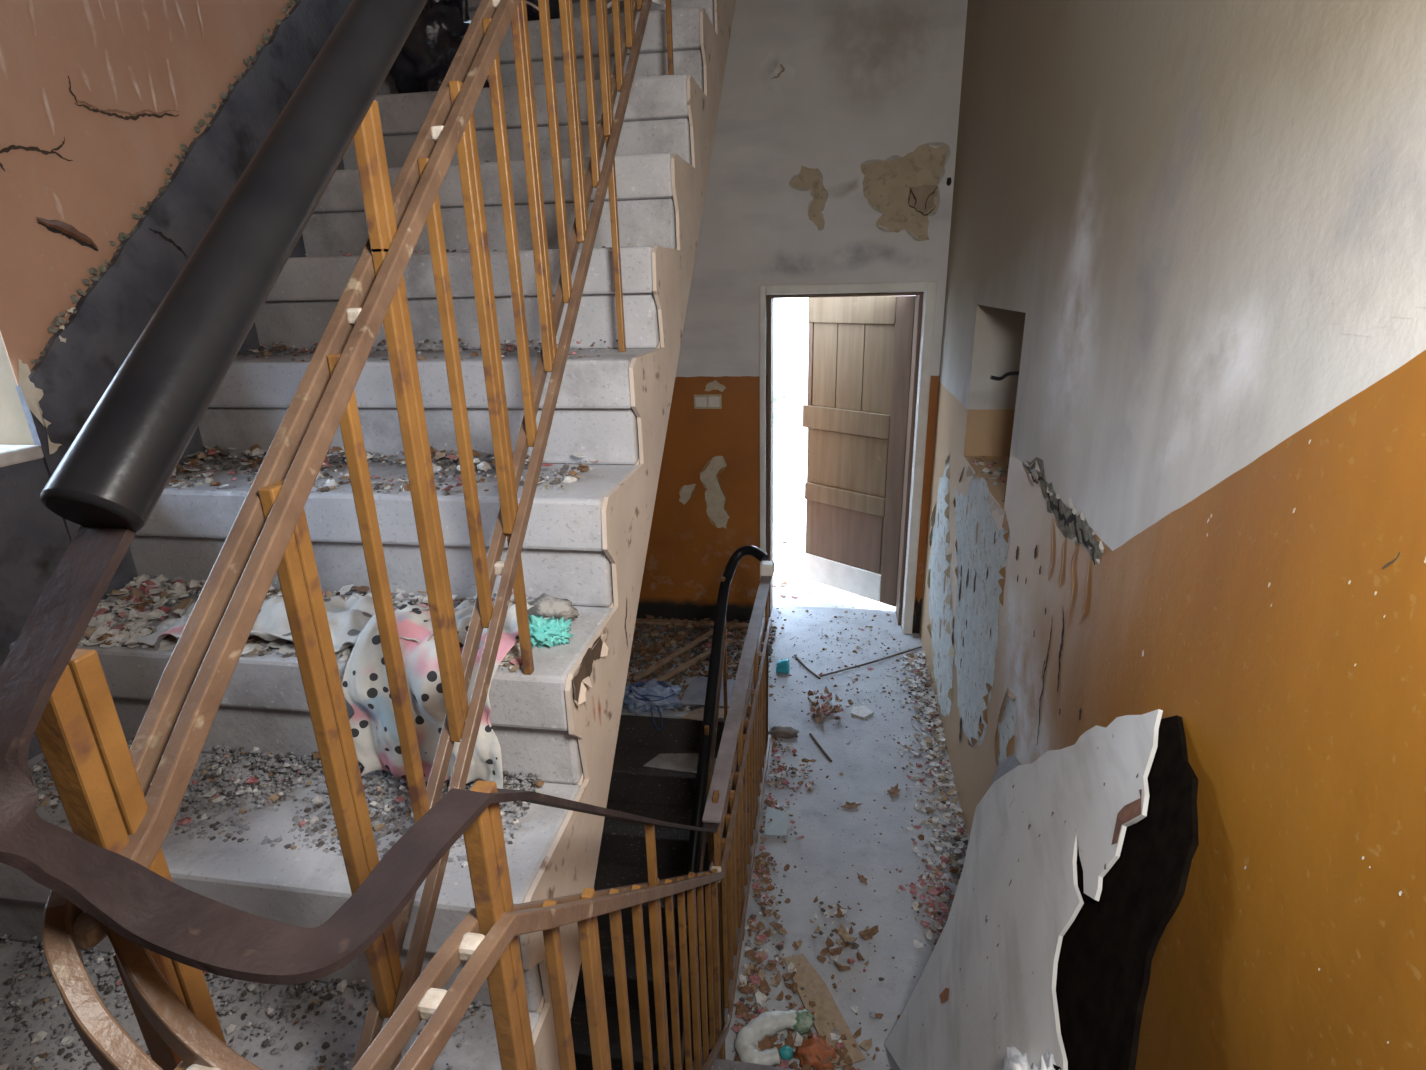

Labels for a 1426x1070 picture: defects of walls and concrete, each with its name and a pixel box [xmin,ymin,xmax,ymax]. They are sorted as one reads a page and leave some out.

crack [68,76,180,121]
crack [0,137,73,171]
flaking render [19,0,300,454]
flaking render [789,166,828,231]
flaking render [861,142,951,242]
peeling [679,456,730,528]
flaking render [1023,457,1104,566]
peeling [927,454,1017,766]
spalling [572,633,608,708]